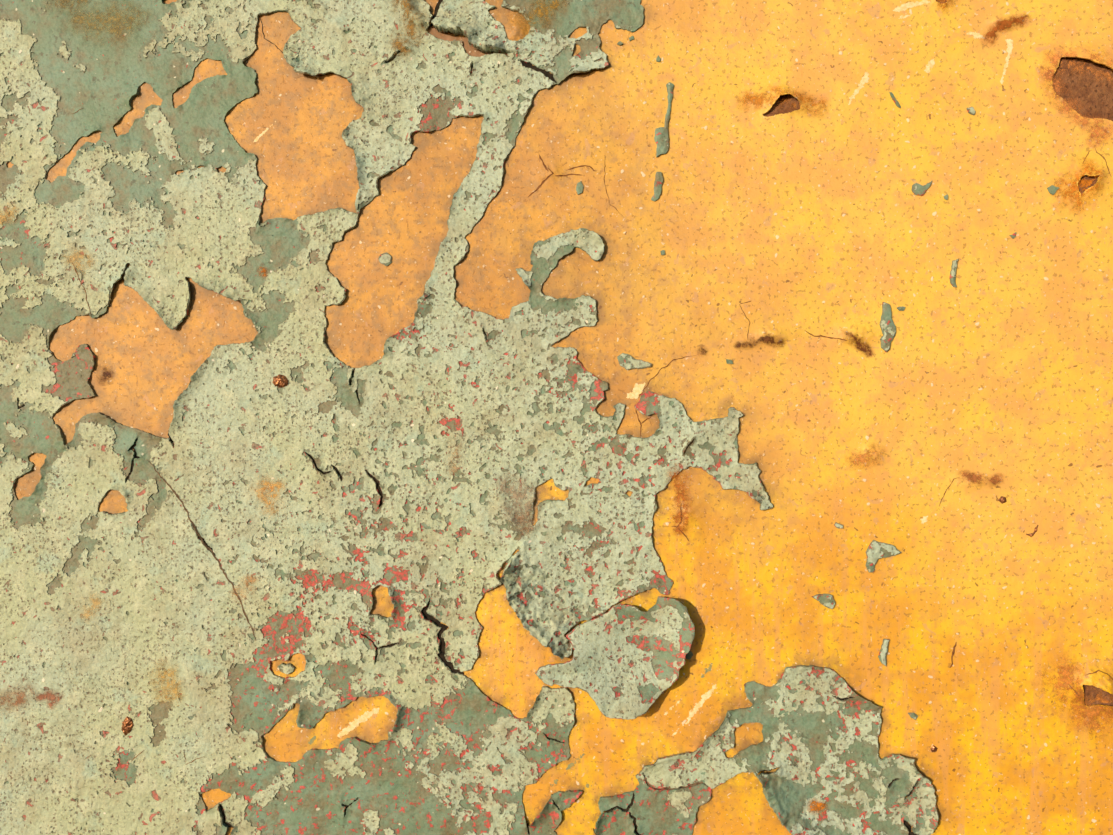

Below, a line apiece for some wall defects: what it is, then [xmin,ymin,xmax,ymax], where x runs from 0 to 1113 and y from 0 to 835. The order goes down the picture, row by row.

peeling [407,0,644,57]
peeling [654,82,674,157]
corrosion [743,84,824,125]
corrosion [1039,36,1113,143]
corrosion [1059,164,1108,206]
peeling [0,0,484,595]
peeling [516,228,605,318]
peeling [879,302,905,352]
crack [126,438,256,641]
peeling [196,478,695,835]
corrosion [1054,665,1113,729]
peeling [594,665,939,835]